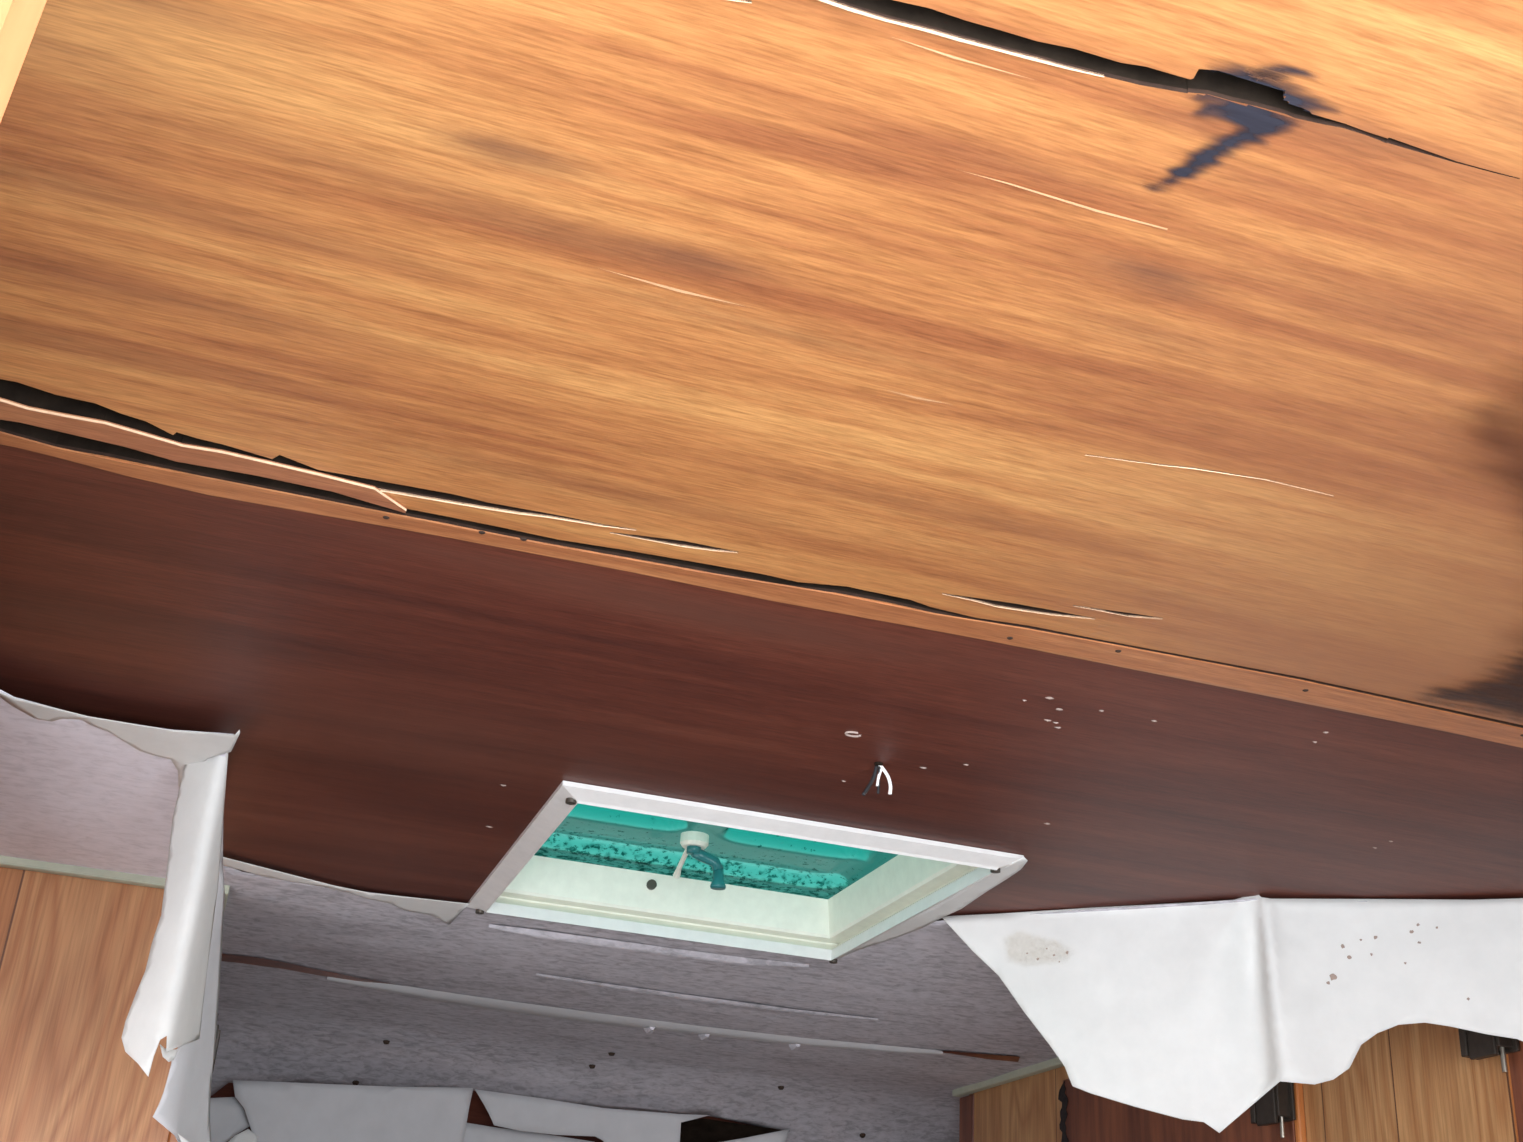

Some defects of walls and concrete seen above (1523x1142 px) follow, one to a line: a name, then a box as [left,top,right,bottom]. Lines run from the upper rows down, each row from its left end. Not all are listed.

crack [817,0,1520,179]
damp [1152,66,1330,189]
crack [0,379,1523,728]
damp [1435,665,1523,714]